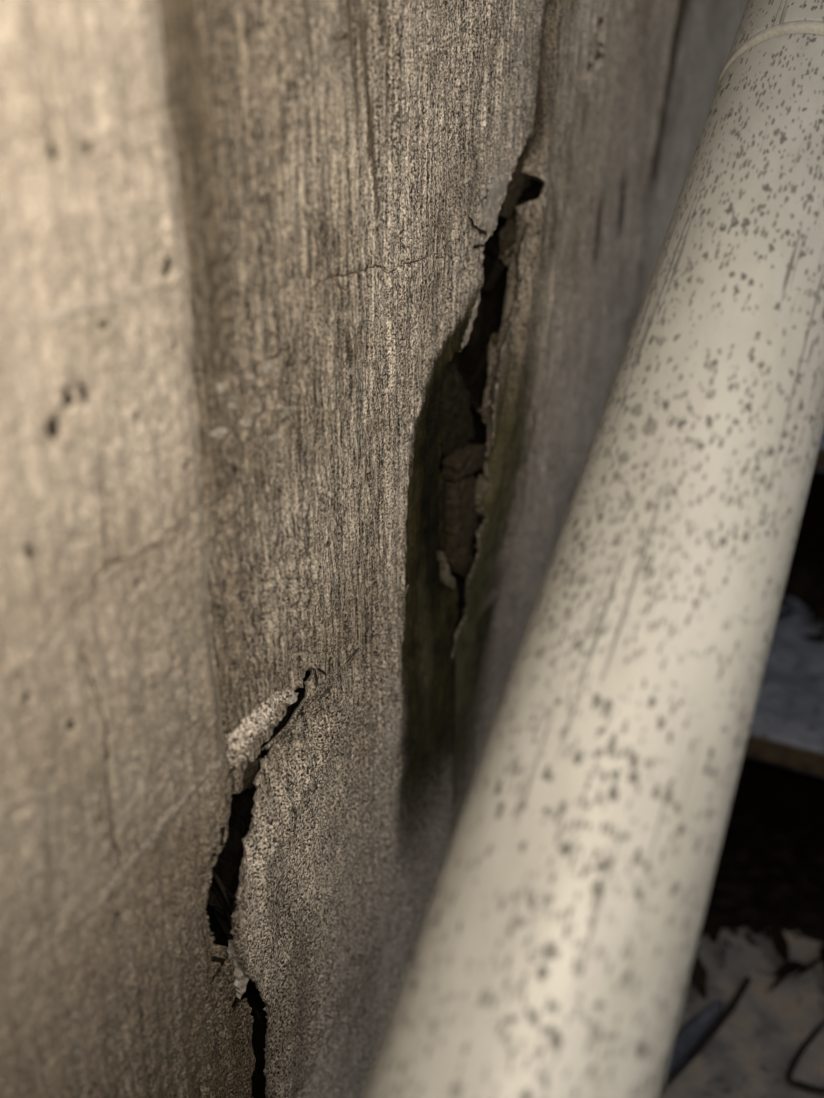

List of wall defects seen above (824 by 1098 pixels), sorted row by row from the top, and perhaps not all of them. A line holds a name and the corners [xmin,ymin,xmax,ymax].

spalling [225,690,299,767]
crack [205,668,333,1098]
damp [417,371,445,714]
crack [436,135,542,677]
damp [453,367,531,780]